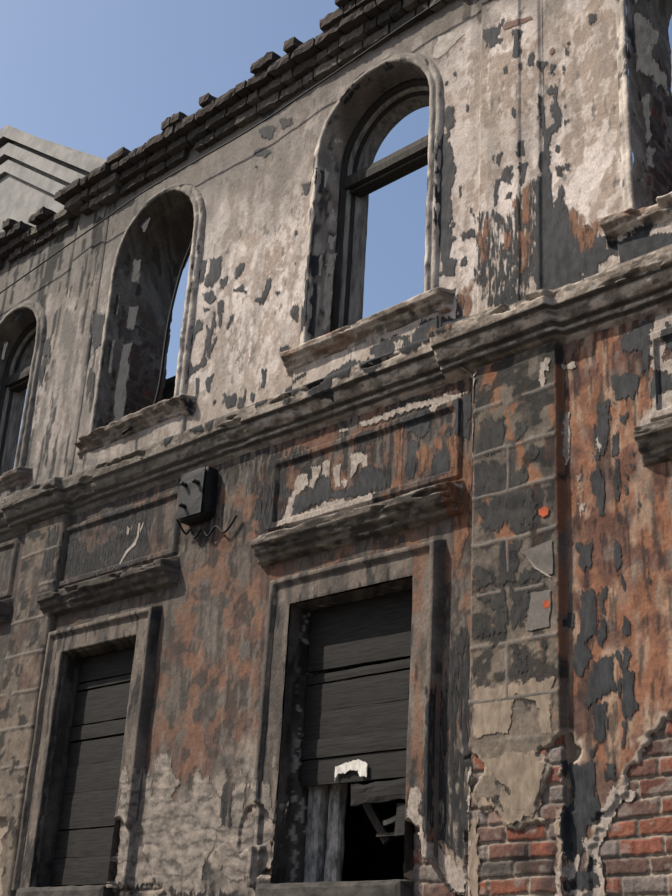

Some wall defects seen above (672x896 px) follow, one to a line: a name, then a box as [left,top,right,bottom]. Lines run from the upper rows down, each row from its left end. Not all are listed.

peeling [482,0,672,290]
peeling [432,106,475,277]
rust [477,218,490,262]
rust [504,185,532,274]
rust [569,204,602,253]
peeling [290,235,337,338]
peeling [181,256,466,416]
rust [457,284,475,317]
peeling [359,390,469,427]
peeling [276,452,375,528]
peeling [334,759,367,777]
flaking render [406,676,672,896]